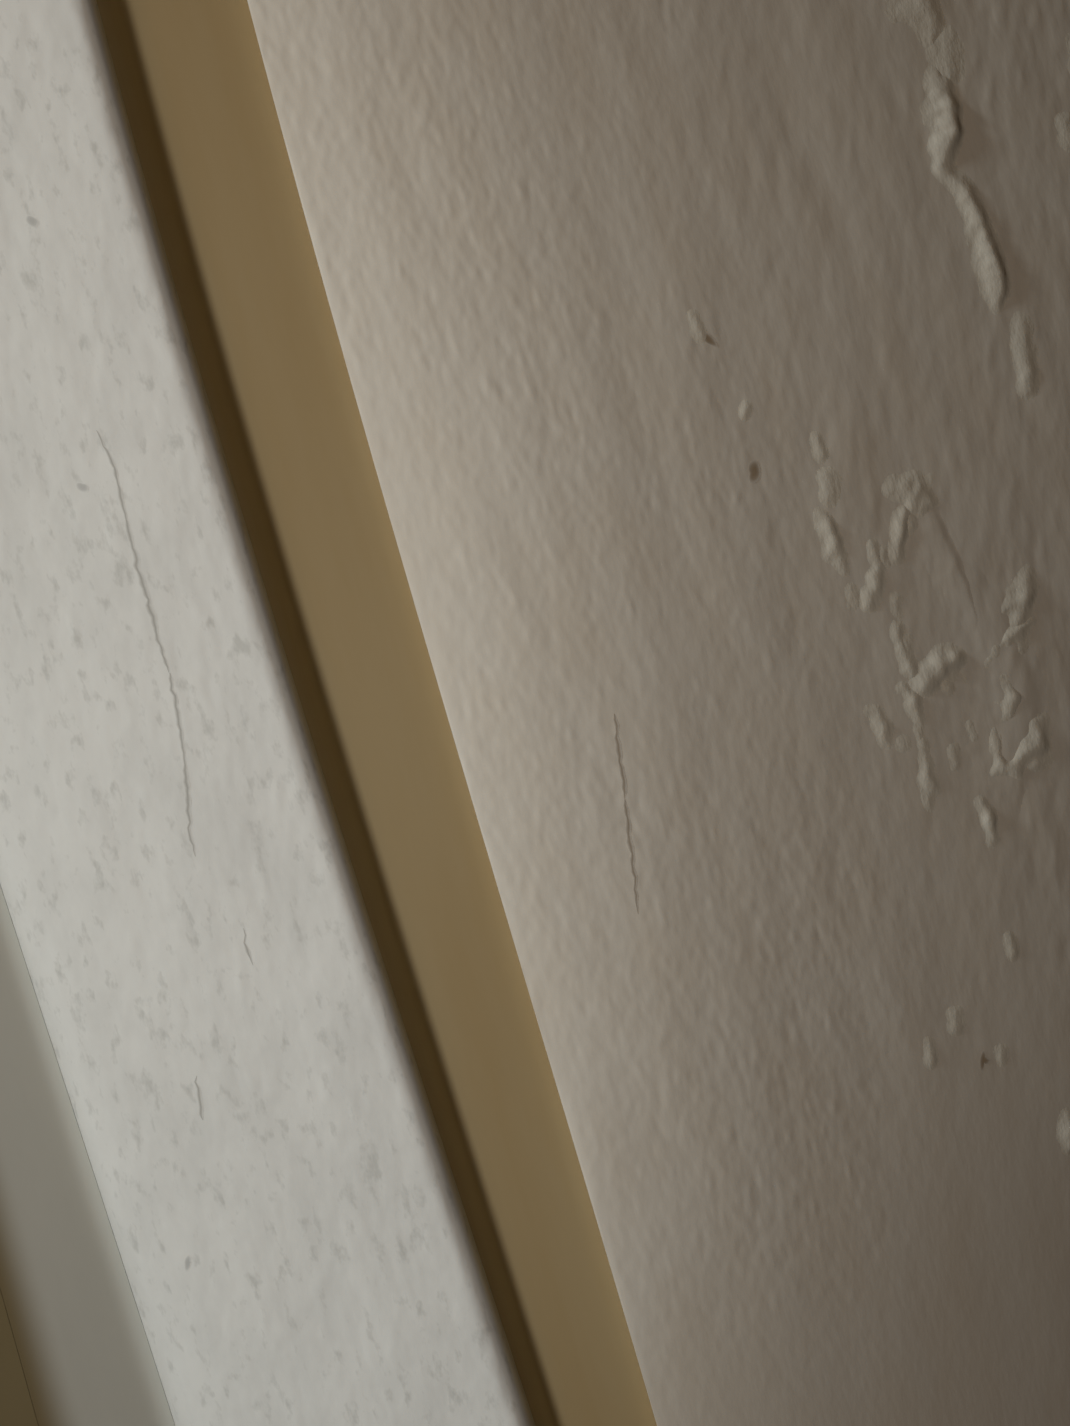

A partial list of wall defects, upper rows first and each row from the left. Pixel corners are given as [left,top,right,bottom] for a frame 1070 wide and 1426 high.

peeling [883,0,1041,400]
crack [96,430,196,857]